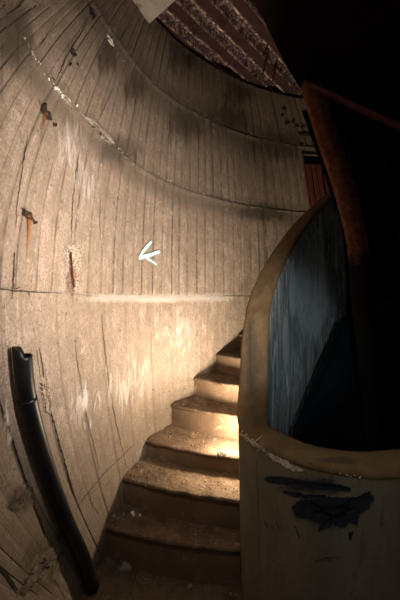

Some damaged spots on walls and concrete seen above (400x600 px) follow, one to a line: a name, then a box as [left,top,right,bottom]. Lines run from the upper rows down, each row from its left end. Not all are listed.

crack [51,326,126,511]
spalling [238,430,303,472]